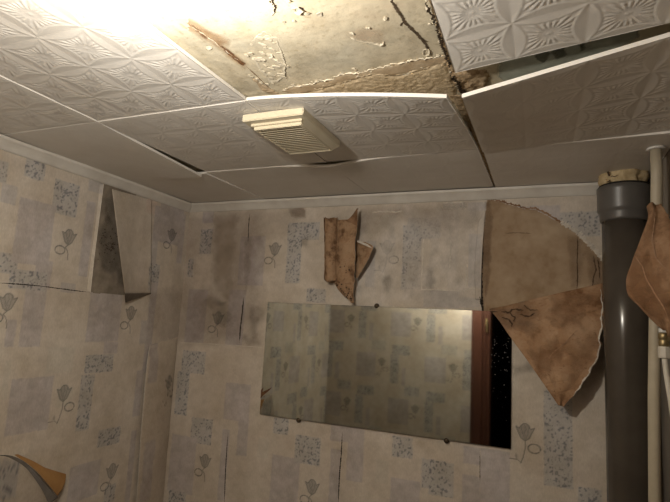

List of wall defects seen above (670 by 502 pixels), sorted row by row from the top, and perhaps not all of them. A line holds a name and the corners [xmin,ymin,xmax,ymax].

spalling [244,0,495,187]
crack [390,0,432,56]